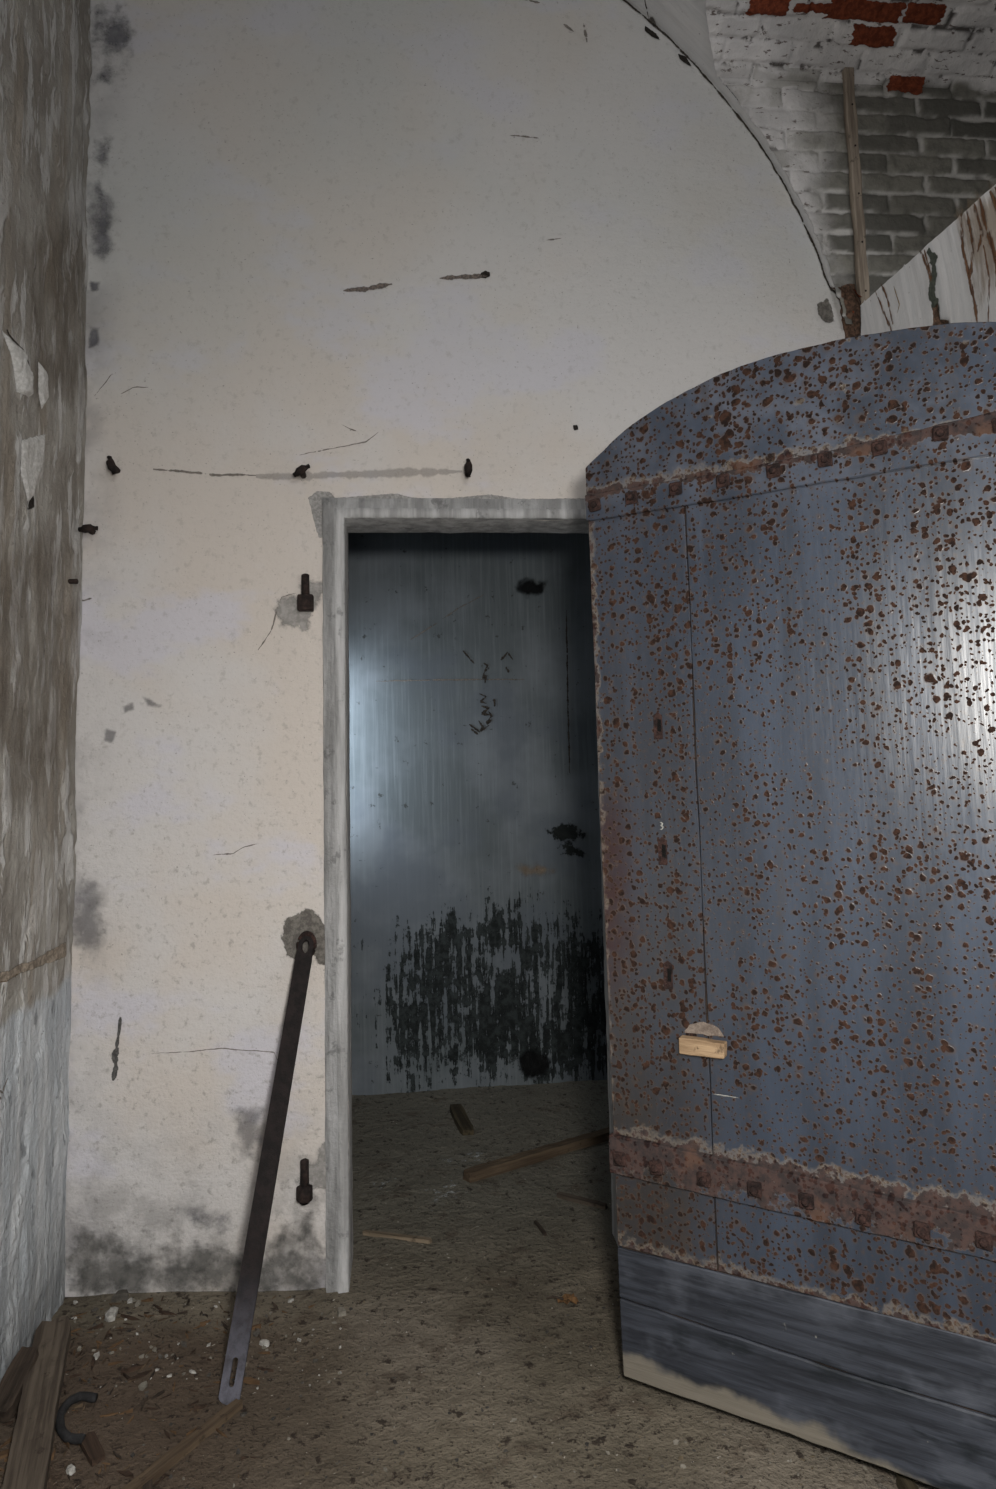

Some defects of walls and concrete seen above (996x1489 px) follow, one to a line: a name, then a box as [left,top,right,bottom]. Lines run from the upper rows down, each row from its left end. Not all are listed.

water stain [96,11,130,47]
water stain [93,187,111,254]
rust [960,187,996,322]
water stain [90,329,99,347]
rust [875,284,900,331]
water stain [356,888,607,1093]
water stain [69,1232,242,1293]
water stain [258,1224,317,1292]